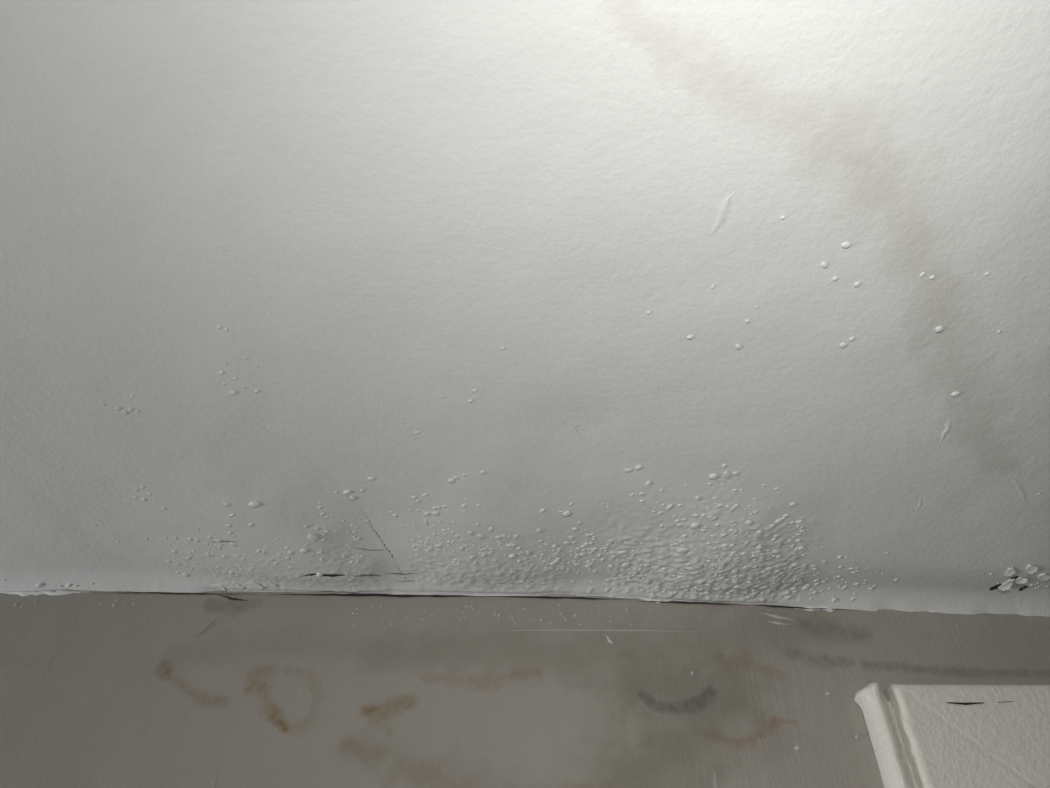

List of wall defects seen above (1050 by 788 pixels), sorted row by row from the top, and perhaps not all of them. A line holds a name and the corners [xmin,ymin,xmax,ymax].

peeling [989,564,1050,592]
leakage [152,603,1050,788]